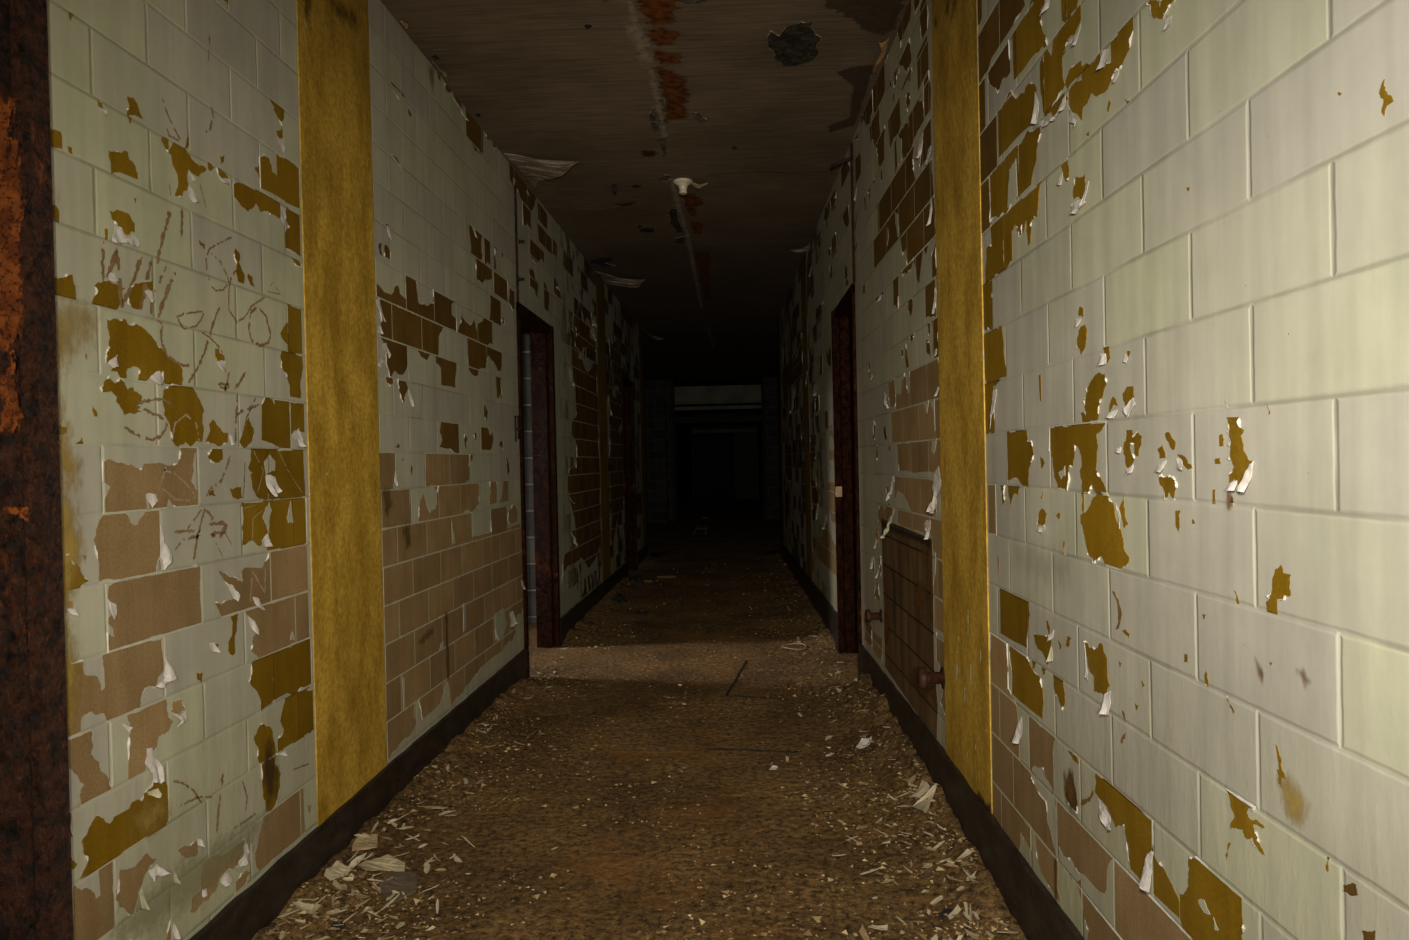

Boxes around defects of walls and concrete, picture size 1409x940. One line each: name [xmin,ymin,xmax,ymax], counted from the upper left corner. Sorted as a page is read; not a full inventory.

corrosion [635,0,690,120]
peeling [1379,79,1394,116]
corrosion [0,96,27,432]
peeling [161,98,302,268]
peeling [807,0,945,715]
peeling [376,223,526,760]
peeling [1156,432,1195,532]
peeling [1212,402,1254,506]
peeling [55,273,314,940]
peeling [1266,565,1291,615]
peeling [989,555,1245,940]
peeling [1226,789,1265,859]